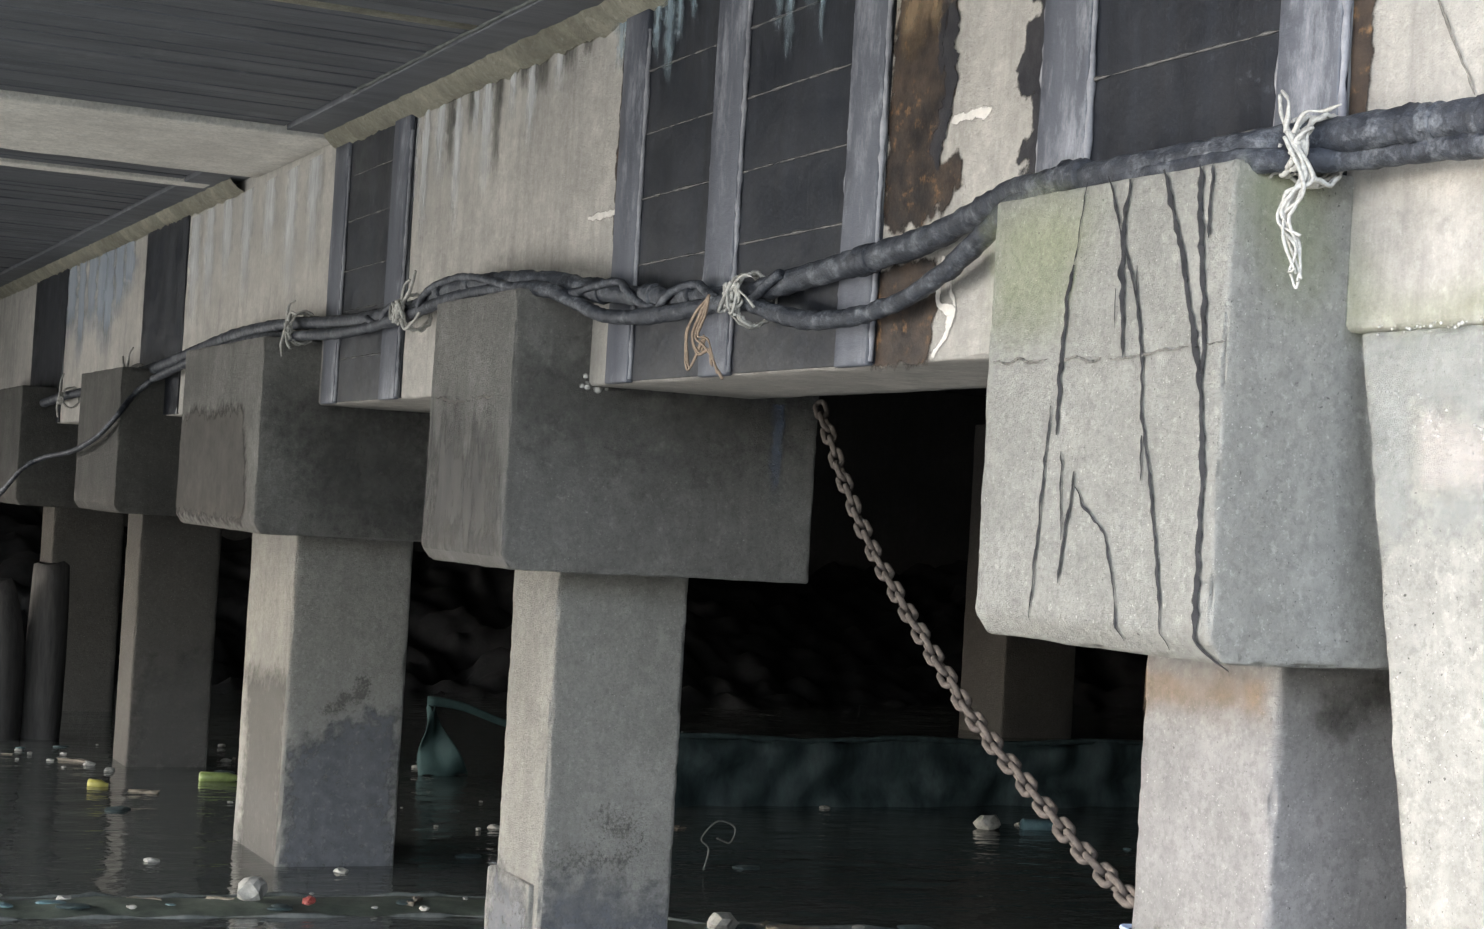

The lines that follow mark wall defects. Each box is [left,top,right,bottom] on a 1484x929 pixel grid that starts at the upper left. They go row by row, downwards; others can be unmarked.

damp [654,0,696,65]
rust [884,0,963,235]
rust [871,258,938,369]
crack [993,164,1229,672]
damp [238,668,398,867]
damp [486,804,668,929]